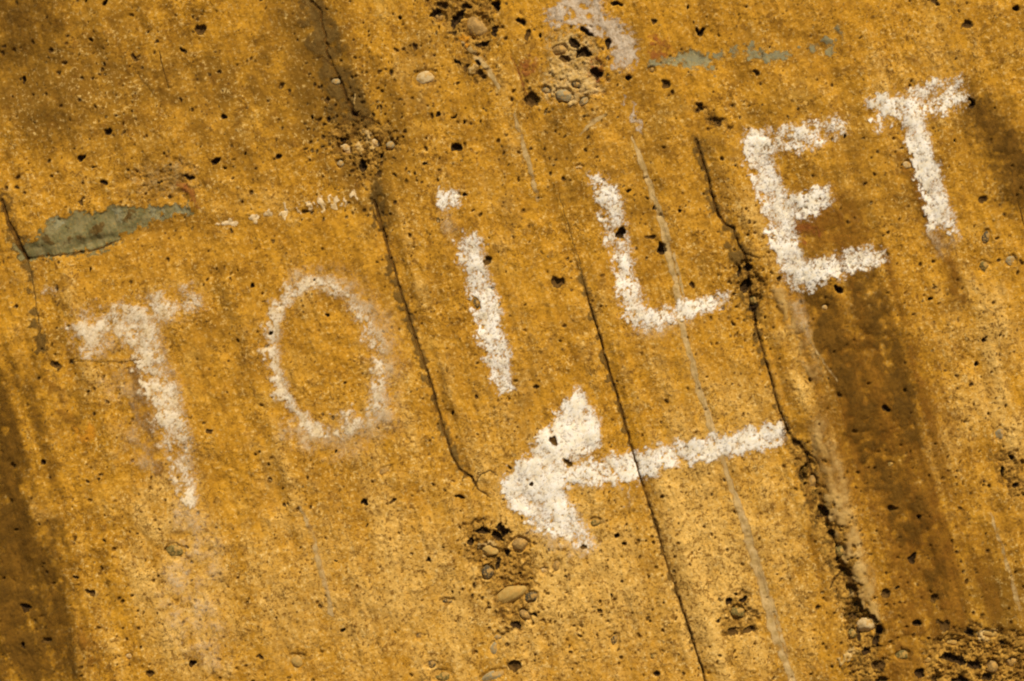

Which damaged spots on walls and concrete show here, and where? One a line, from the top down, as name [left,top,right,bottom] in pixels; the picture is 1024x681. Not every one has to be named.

spalling [425,0,503,84]
spalling [542,26,612,107]
peeling [12,161,195,261]
leakage [897,151,966,303]
crack [370,181,498,498]
crack [559,193,706,681]
crack [693,137,875,681]
leakage [790,195,967,681]
spalling [461,518,559,654]